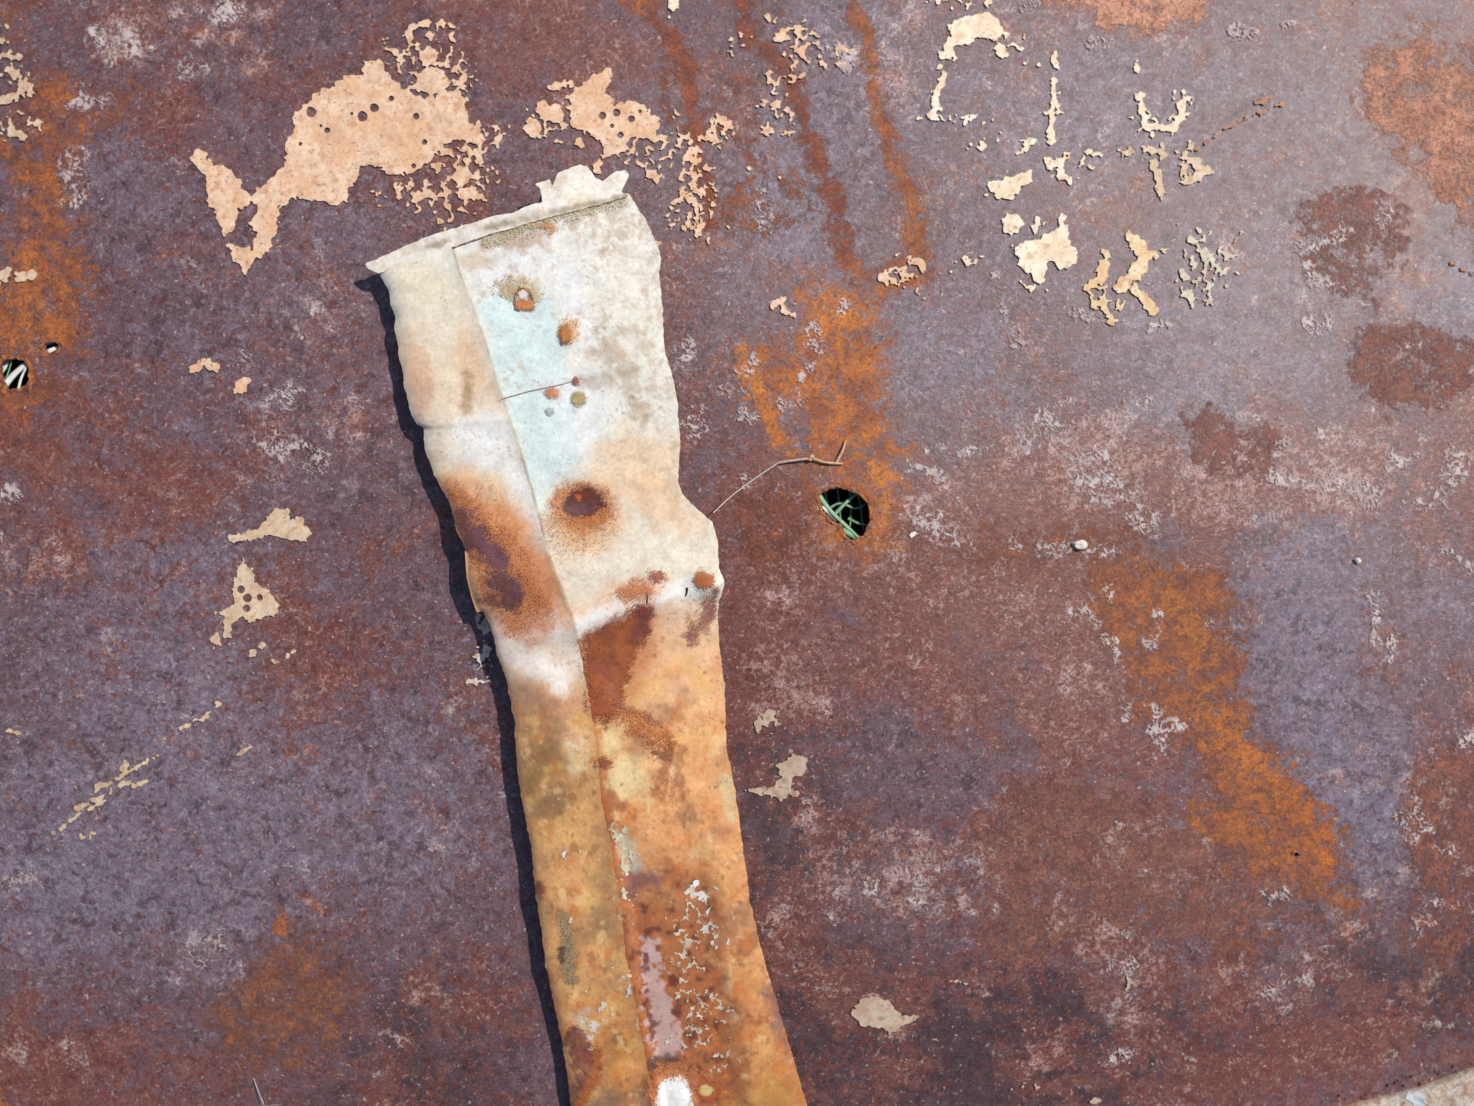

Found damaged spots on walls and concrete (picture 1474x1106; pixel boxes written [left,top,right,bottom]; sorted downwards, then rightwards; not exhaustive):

rust [350,104,379,122]
peeling [190,18,735,275]
peeling [756,13,854,136]
peeling [916,0,1214,292]
peeling [770,296,796,318]
peeling [878,253,926,299]
peeling [1083,223,1244,326]
peeling [210,508,312,657]
peeling [851,996,919,1035]